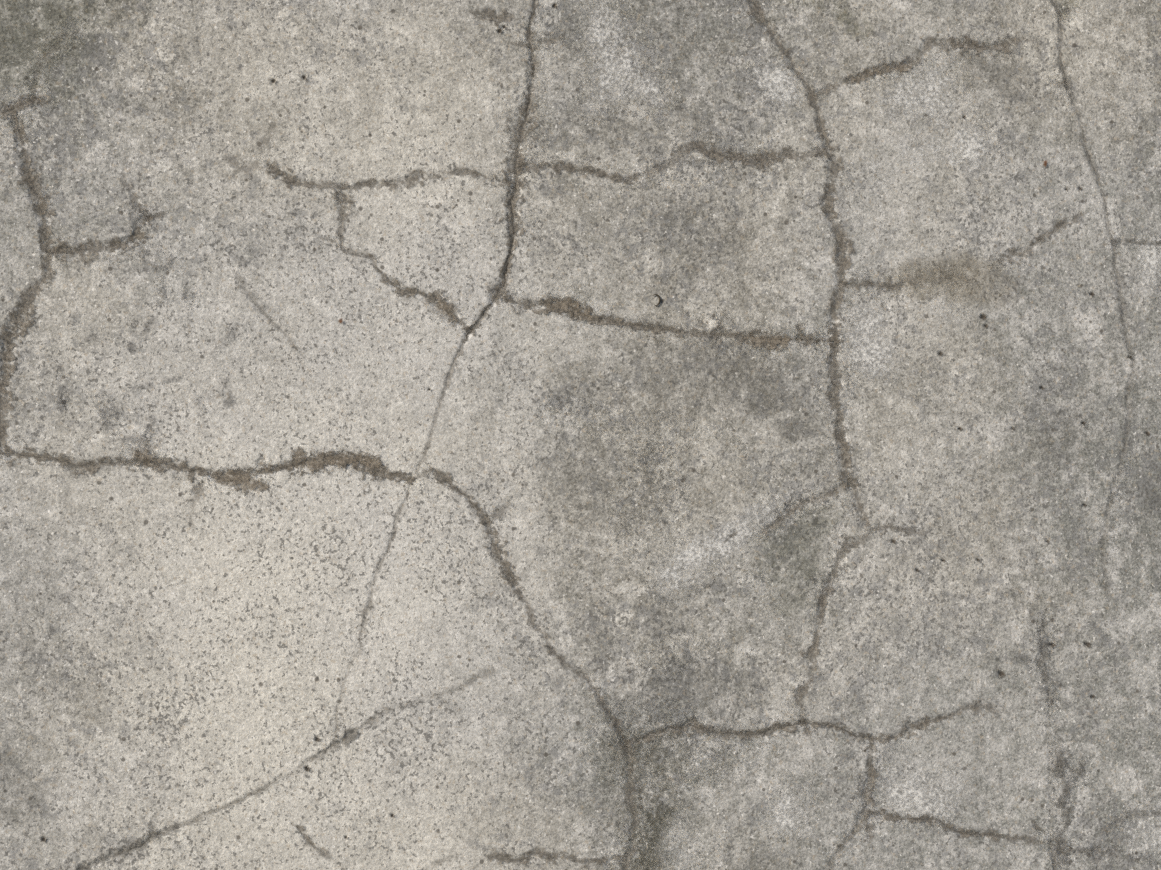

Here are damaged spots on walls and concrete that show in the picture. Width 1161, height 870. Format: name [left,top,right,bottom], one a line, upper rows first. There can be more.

crack [1057,10,1068,87]
crack [1082,131,1147,244]
crack [1003,217,1076,265]
crack [265,0,1015,554]
crack [0,94,565,662]
crack [311,718,373,760]
crack [578,578,1069,870]
crack [219,783,272,810]
crack [1053,756,1076,808]
crack [76,823,189,870]
crack [298,825,316,849]
crack [487,848,619,870]